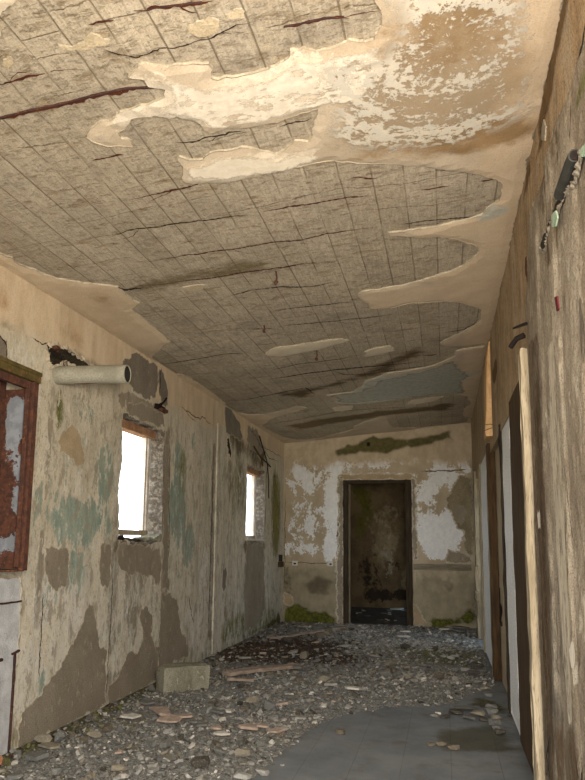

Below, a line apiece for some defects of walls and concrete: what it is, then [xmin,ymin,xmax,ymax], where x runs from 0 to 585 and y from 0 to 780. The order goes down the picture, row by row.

crack [134,1,213,13]
crack [290,11,375,27]
crack [107,22,251,58]
crack [0,69,76,85]
crack [0,89,136,120]
spalling [539,144,585,254]
spalling [0,0,531,460]
mould [336,432,449,455]
spalling [445,475,474,564]
flaking render [335,472,419,624]